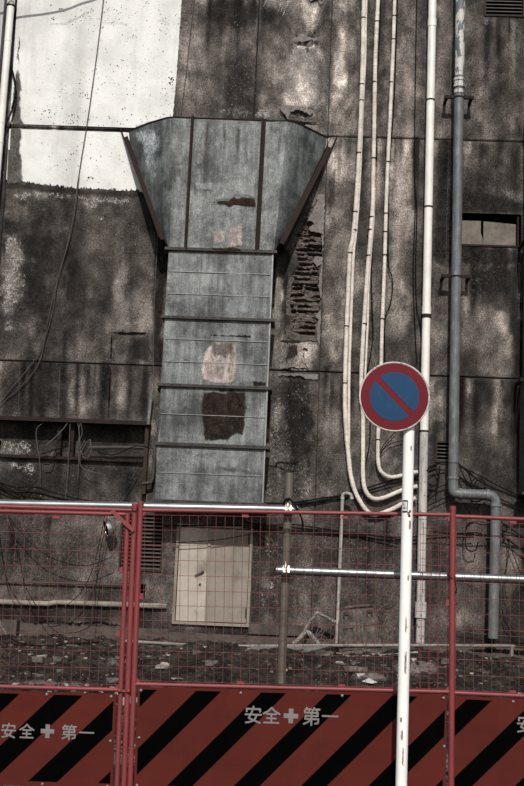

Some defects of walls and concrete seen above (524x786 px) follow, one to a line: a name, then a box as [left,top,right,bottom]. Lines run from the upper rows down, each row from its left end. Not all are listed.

water stain [0,220,67,332]
spalling [285,194,325,351]